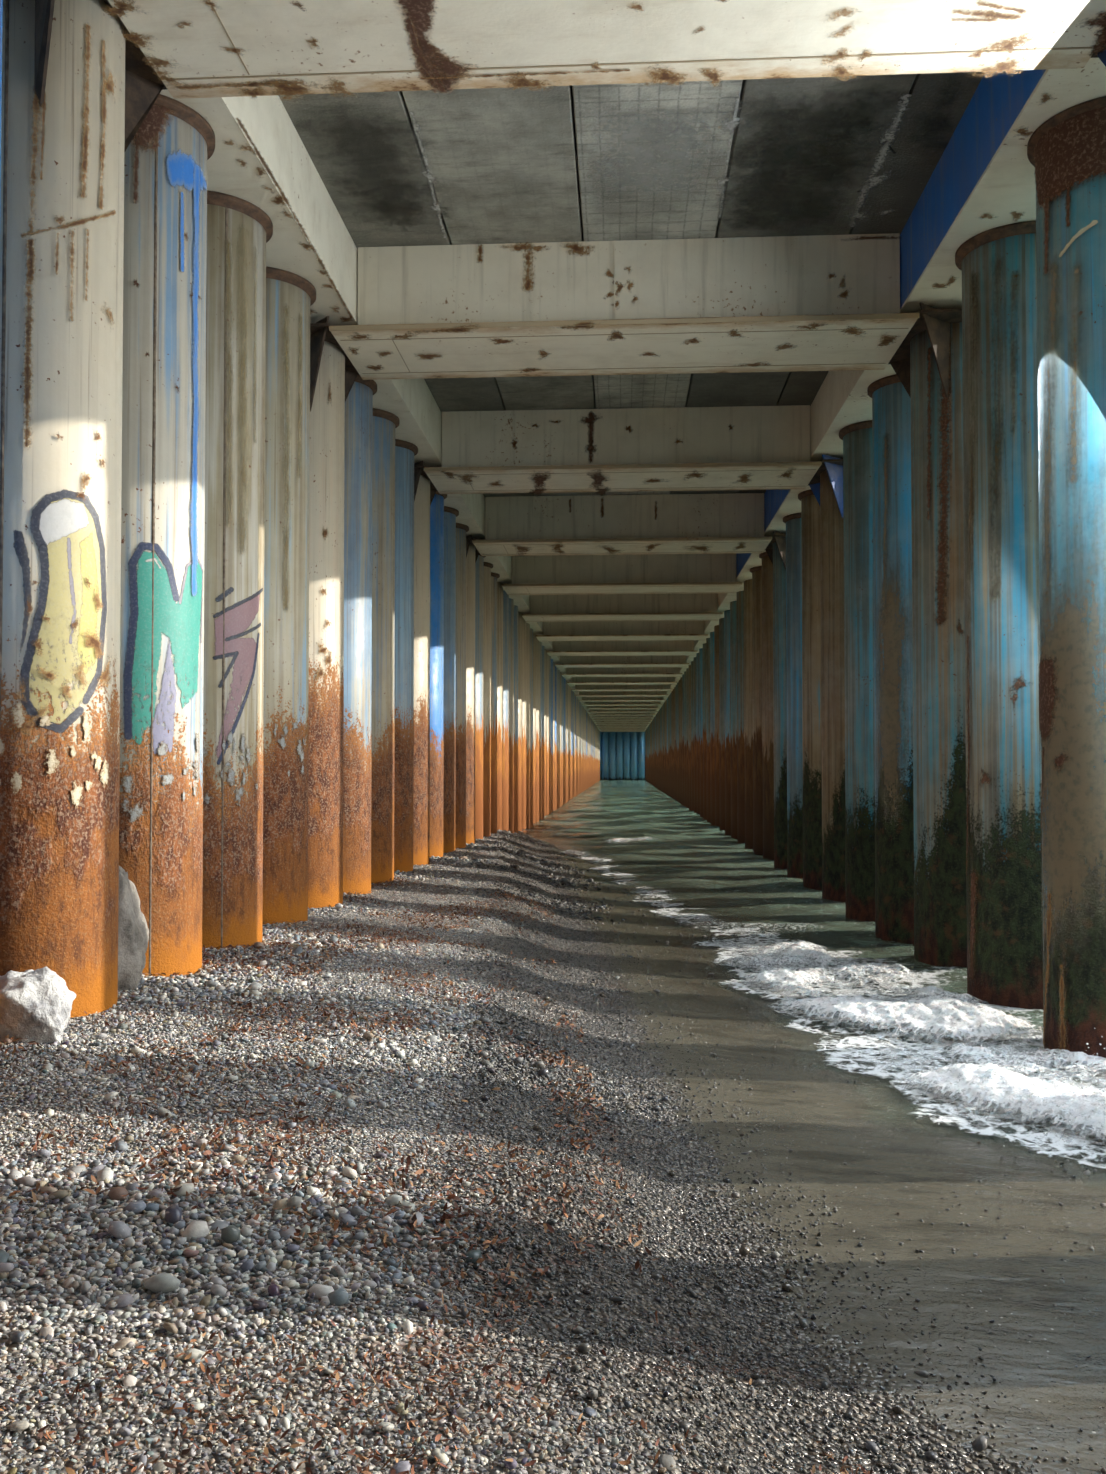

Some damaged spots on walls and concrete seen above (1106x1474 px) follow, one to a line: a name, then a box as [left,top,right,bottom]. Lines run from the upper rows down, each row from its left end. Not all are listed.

rust [103,0,354,100]
rust [398,0,630,92]
rust [645,68,721,86]
rust [823,9,871,80]
rust [952,2,1034,76]
rust [21,24,116,447]
rust [225,118,474,370]
leakage [328,112,446,238]
leakage [717,94,912,228]
rust [1016,106,1106,274]
rust [926,338,991,982]
rust [0,620,475,1018]